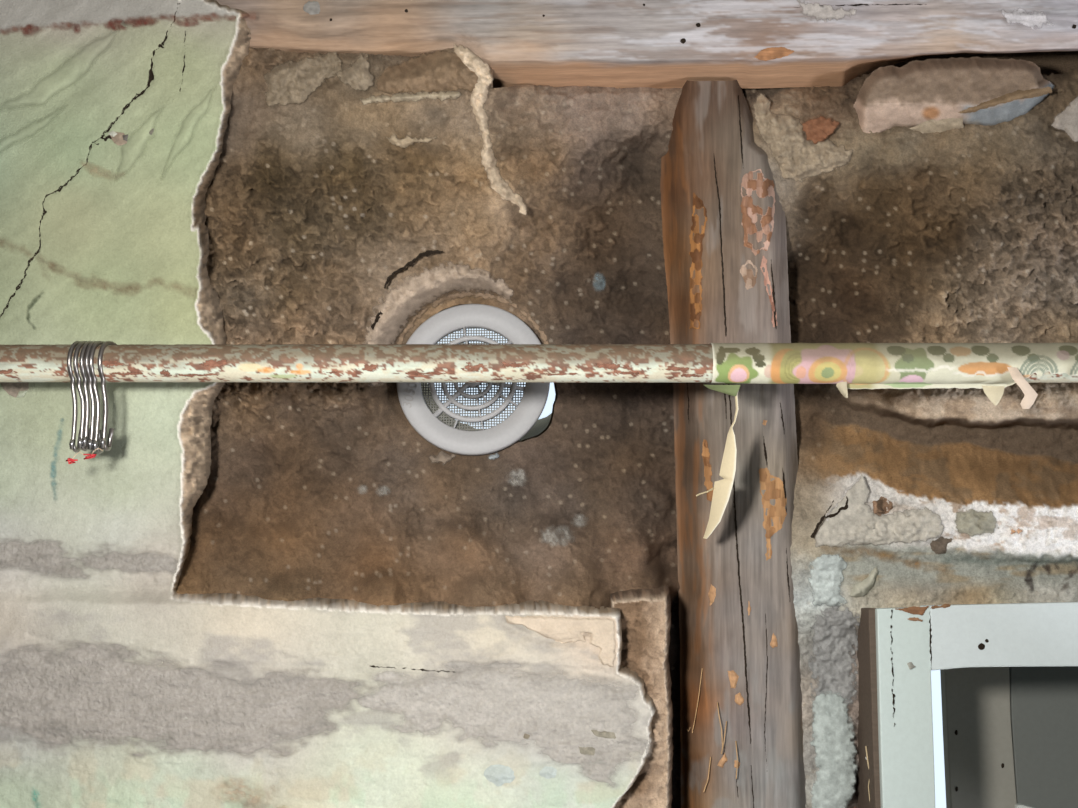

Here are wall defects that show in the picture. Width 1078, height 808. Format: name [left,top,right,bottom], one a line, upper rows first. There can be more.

crack [0,3,186,317]
flaking render [204,47,682,345]
flaking render [0,382,681,808]